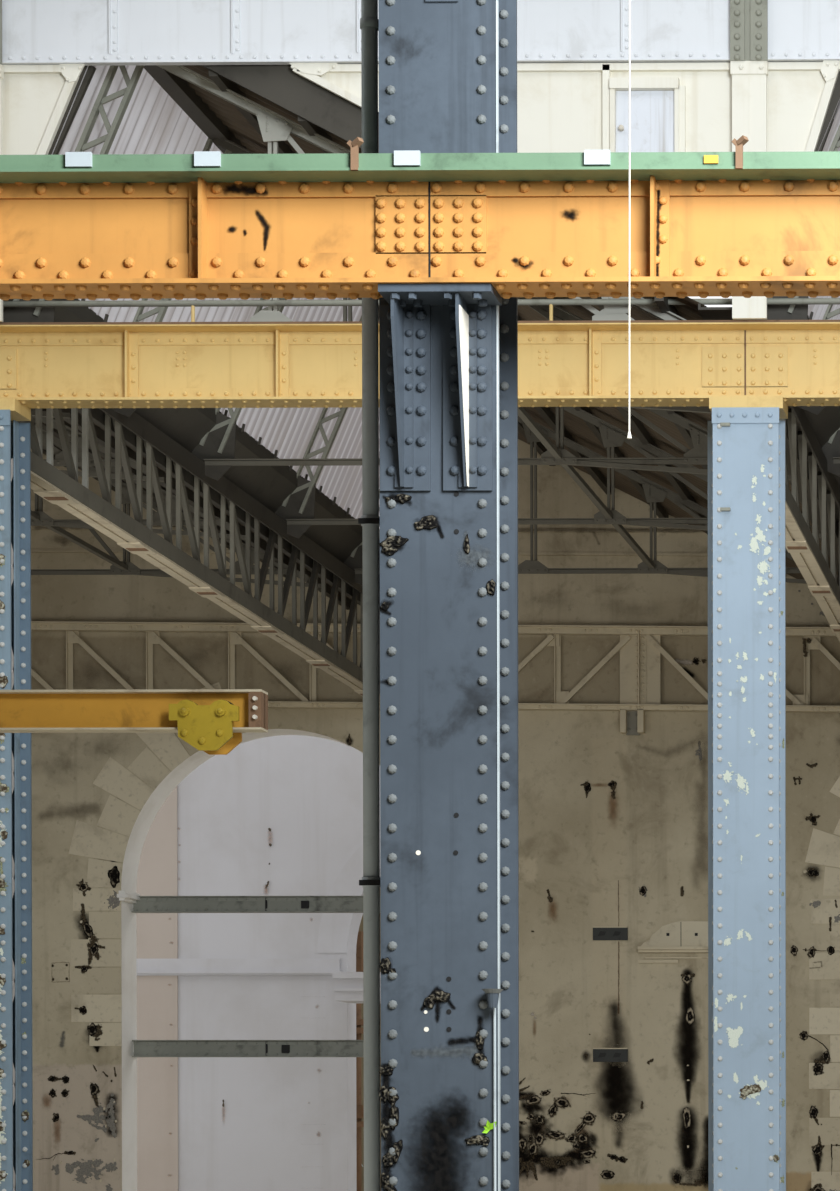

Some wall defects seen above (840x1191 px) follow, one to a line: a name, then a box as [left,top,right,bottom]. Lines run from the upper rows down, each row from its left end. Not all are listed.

peeling [735,464,776,605]
peeling [728,638,777,702]
peeling [722,762,749,795]
peeling [0,808,9,896]
peeling [0,1030,8,1184]
peeling [77,1082,117,1142]
peeling [23,1151,118,1191]